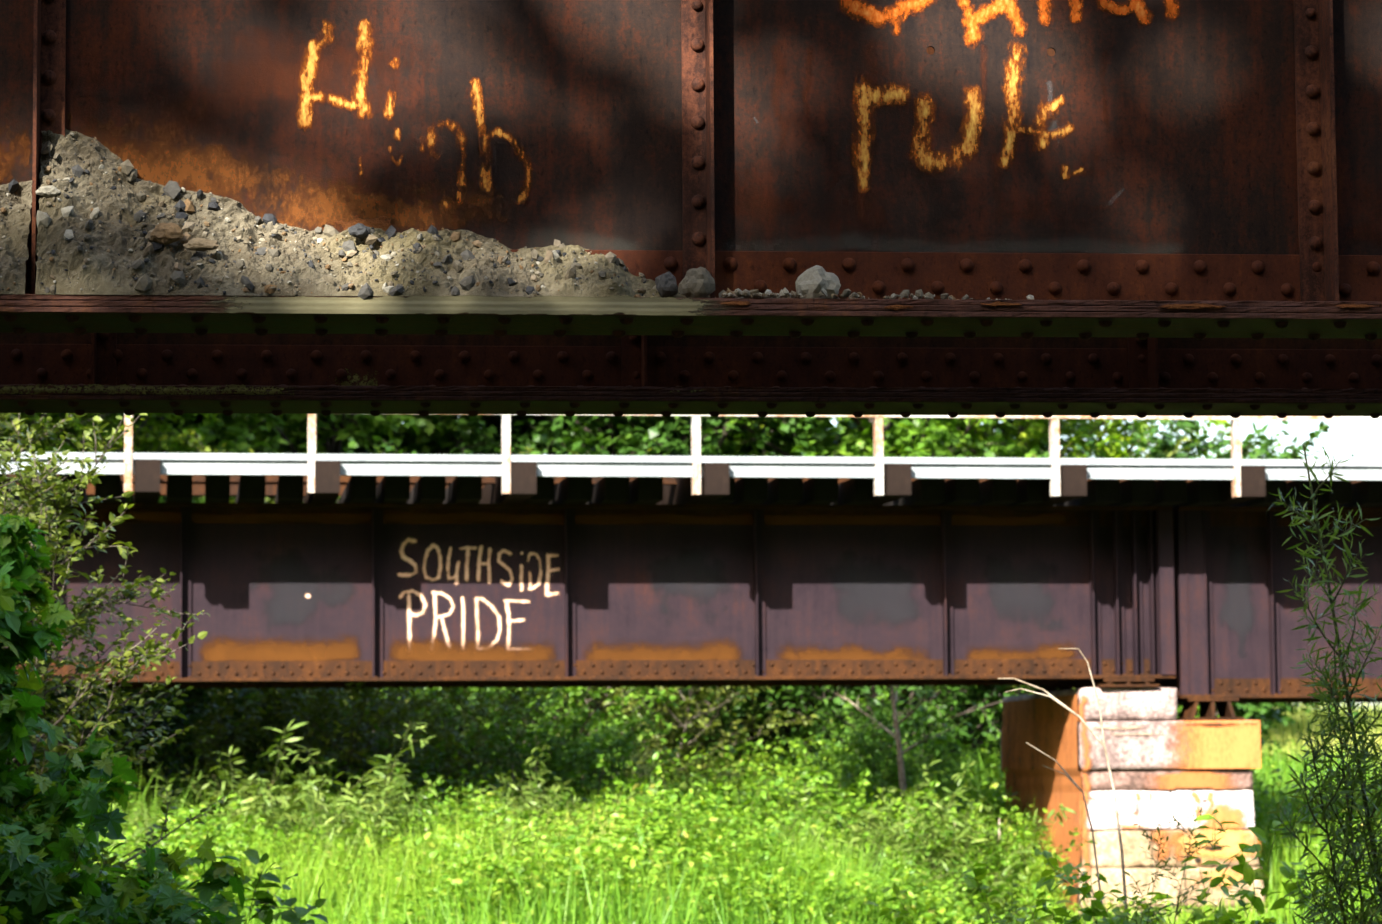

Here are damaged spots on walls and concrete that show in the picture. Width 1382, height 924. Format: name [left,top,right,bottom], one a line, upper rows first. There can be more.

corrosion [87,111,501,233]